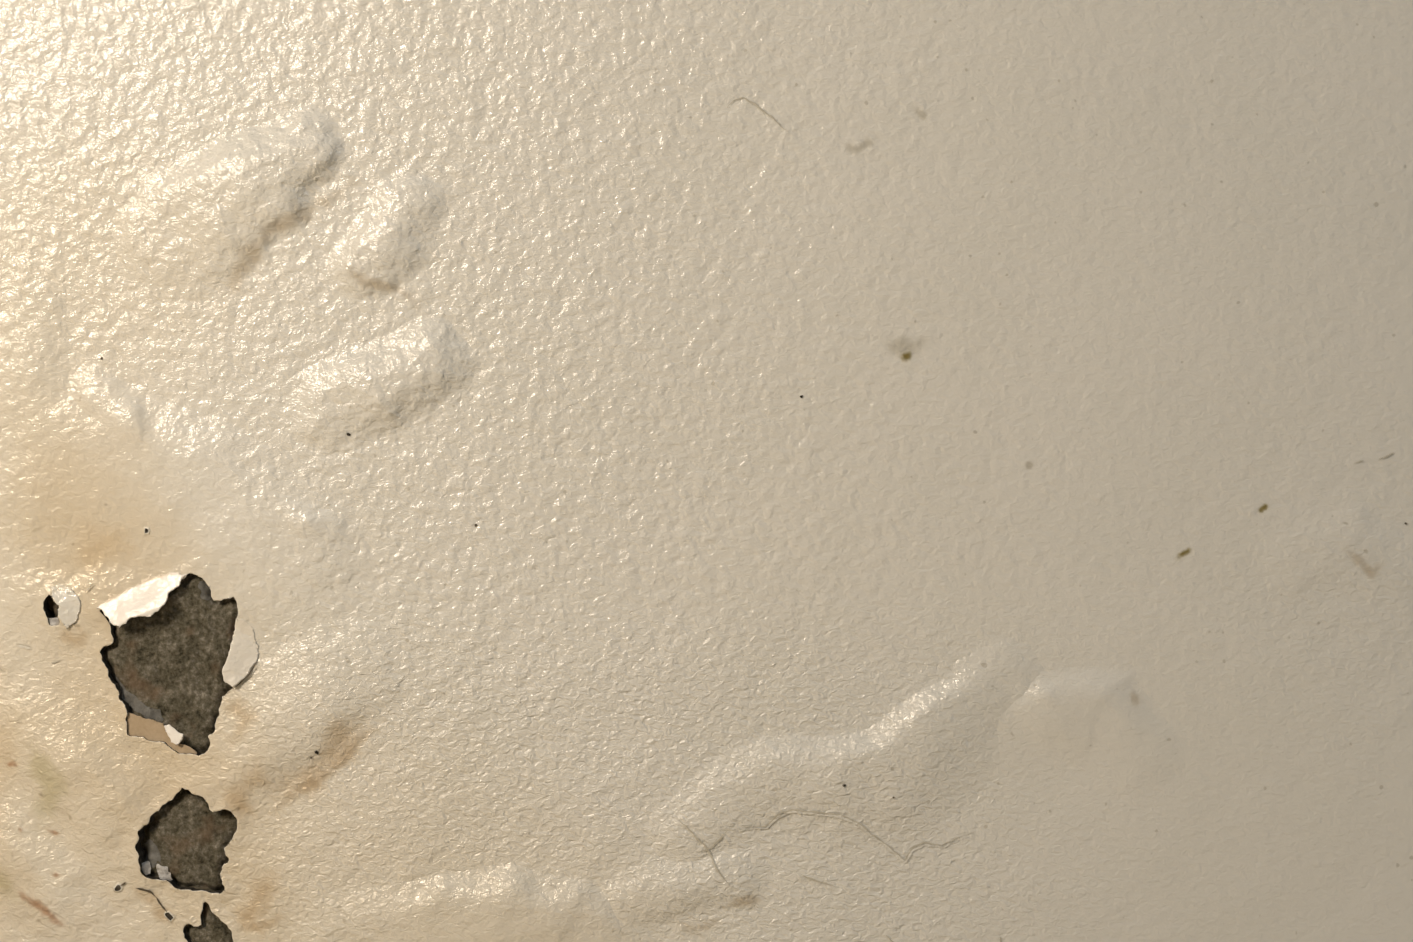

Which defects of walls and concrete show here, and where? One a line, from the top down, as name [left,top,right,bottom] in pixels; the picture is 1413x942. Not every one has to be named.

peeling [35,554,259,942]